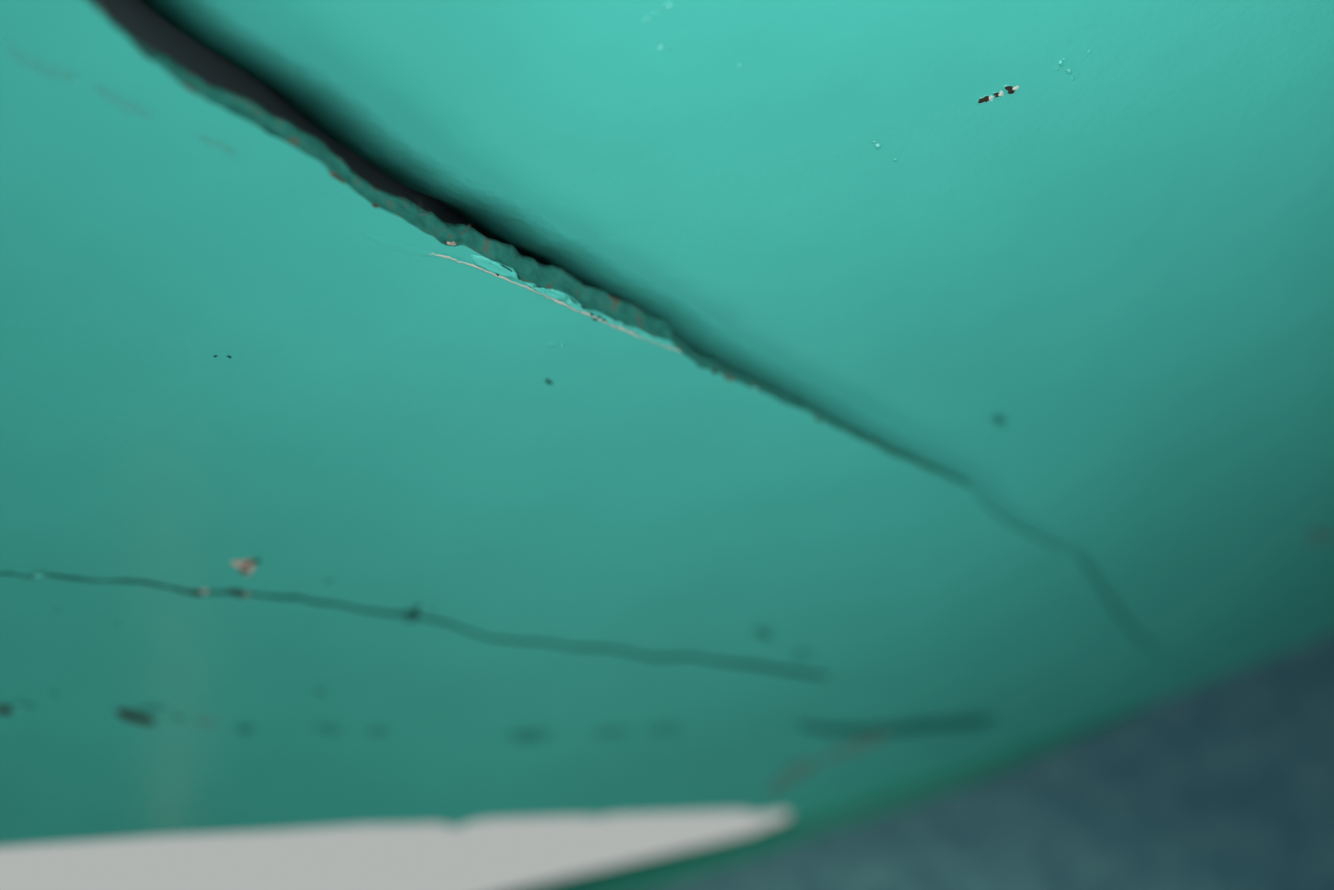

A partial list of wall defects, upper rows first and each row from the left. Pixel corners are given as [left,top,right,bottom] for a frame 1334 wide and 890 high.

peeling [976,85,1019,105]
crack [0,0,1207,680]
peeling [225,556,260,579]
crack [116,706,249,732]